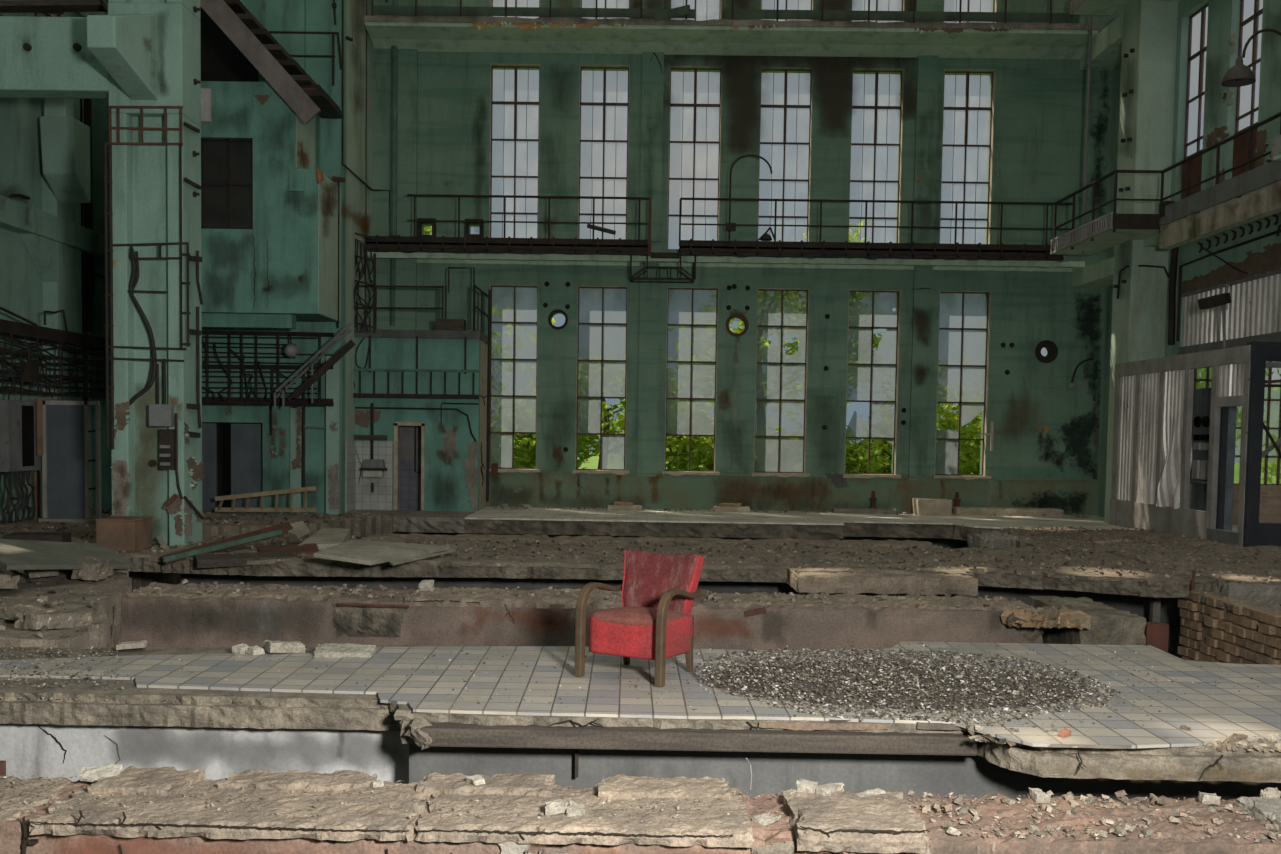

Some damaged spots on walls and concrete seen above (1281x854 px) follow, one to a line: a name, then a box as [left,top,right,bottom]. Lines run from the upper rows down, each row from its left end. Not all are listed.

peeling [163,422,204,539]
crack [37,724,67,763]
crack [22,810,733,854]